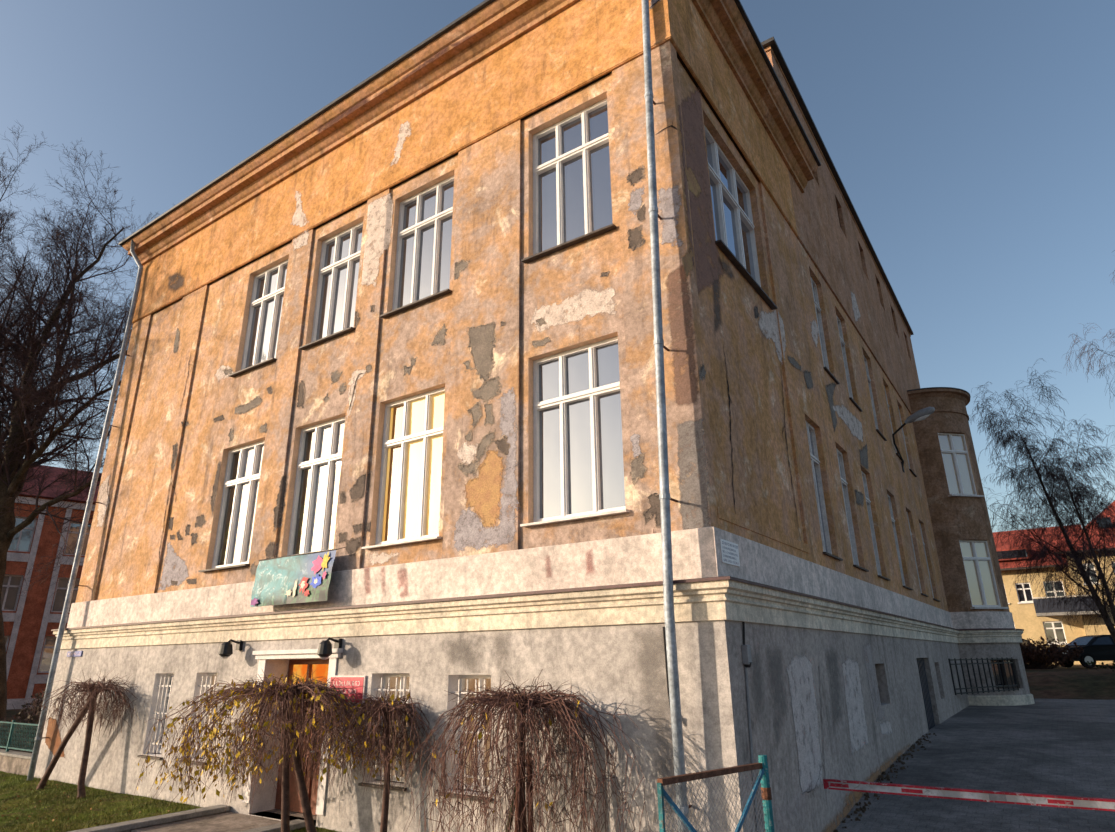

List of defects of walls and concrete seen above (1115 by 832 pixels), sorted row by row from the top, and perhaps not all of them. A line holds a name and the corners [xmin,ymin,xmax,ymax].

peeling [391,121,411,165]
peeling [360,193,393,287]
peeling [530,271,616,348]
flaking render [457,322,511,528]
crack [723,346,736,514]